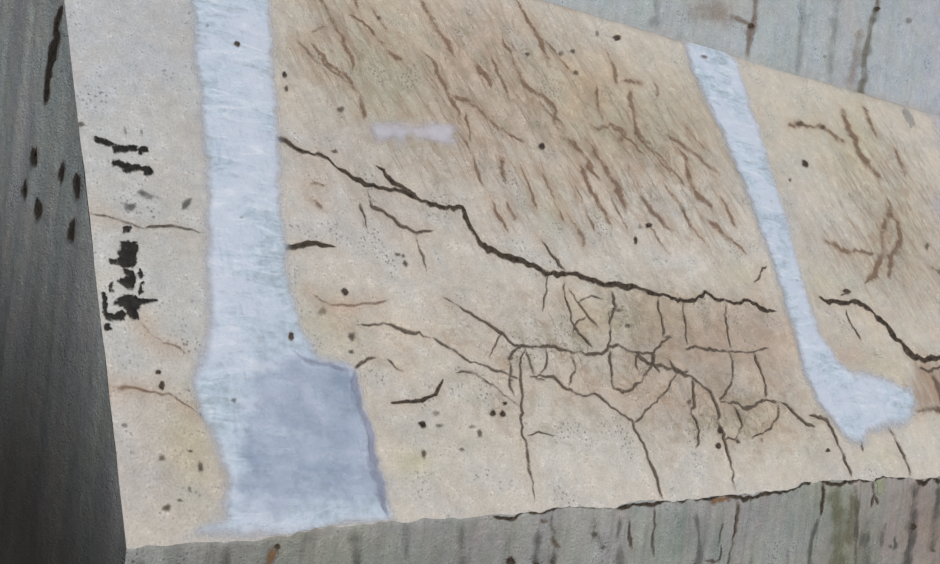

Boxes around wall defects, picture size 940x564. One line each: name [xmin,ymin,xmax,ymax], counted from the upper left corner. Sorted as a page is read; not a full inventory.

peeling [94,136,115,146]
peeling [101,258,158,330]
crack [277,0,940,564]